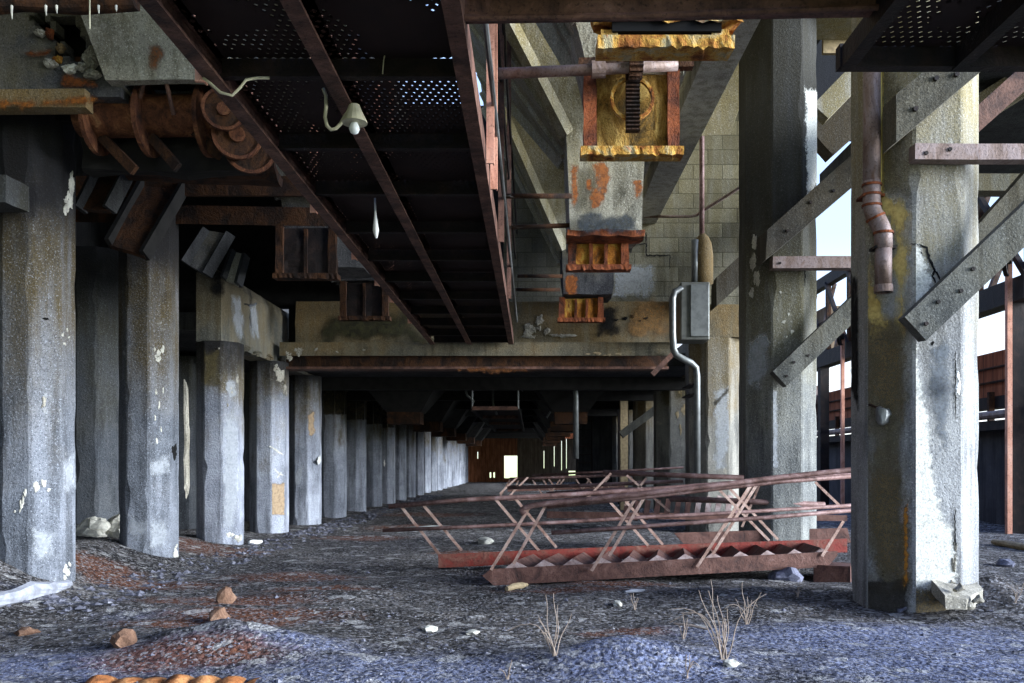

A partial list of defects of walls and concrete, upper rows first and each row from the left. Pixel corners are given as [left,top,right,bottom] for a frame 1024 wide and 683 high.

spalling [34,27,102,80]
corrosion [0,74,97,108]
peeling [63,171,75,215]
corrosion [570,162,610,208]
crack [911,243,940,286]
leakage [597,307,620,337]
leakage [850,72,958,613]